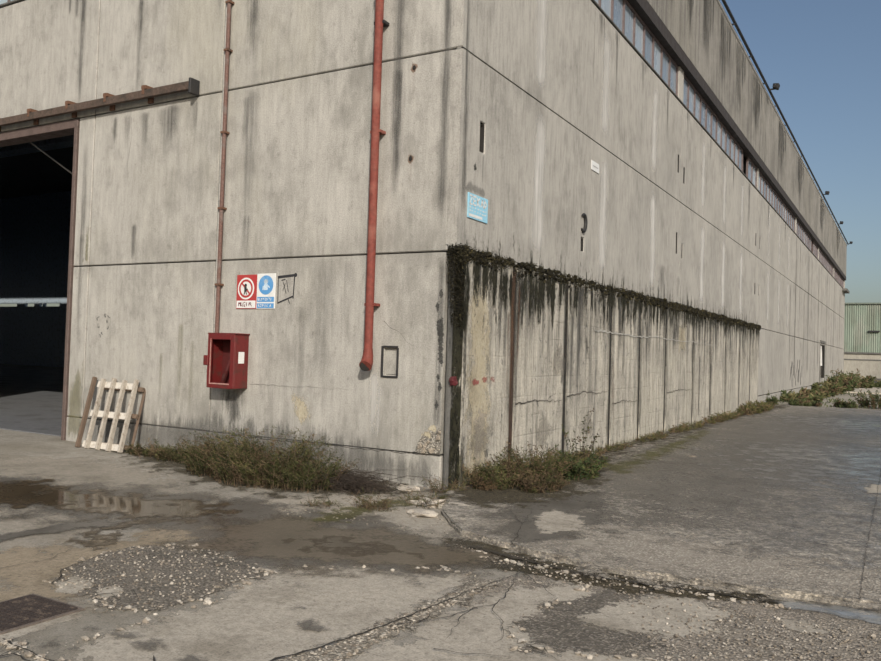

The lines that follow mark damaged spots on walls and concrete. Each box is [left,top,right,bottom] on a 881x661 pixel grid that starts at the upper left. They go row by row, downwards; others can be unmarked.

leakage [465,266,502,476]
leakage [564,286,584,400]
leakage [610,298,625,358]
leakage [664,309,712,410]
spalling [415,425,441,455]
spalling [88,543,308,634]
crack [270,504,782,661]
spalling [464,548,791,609]
crack [0,638,54,661]
spalling [0,637,74,661]
spalling [505,614,558,653]
spalling [575,651,670,661]